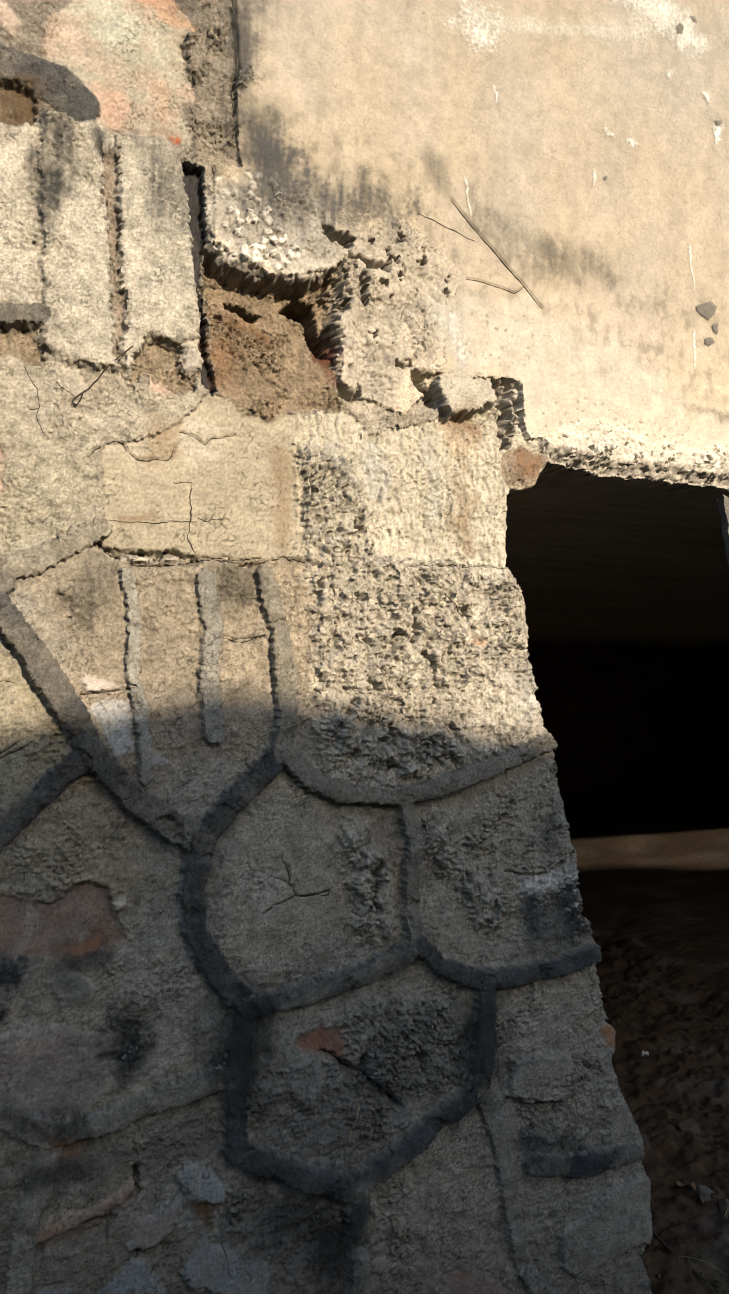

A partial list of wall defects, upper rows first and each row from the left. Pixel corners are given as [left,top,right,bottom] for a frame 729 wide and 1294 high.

water stain [448,0,498,48]
water stain [629,0,706,53]
spalling [100,142,462,422]
spalling [490,376,729,497]
crack [263,856,326,914]